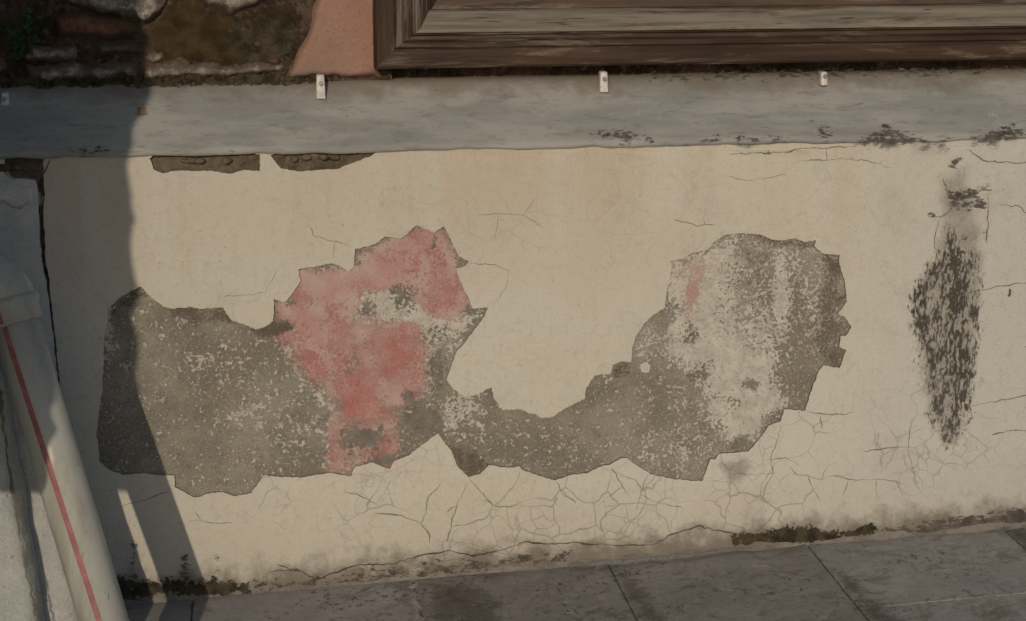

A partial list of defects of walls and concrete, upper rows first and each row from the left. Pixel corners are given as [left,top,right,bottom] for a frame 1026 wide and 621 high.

spalling [150,153,374,173]
damp [855,124,962,169]
peeling [97,226,850,496]
damp [908,179,992,450]
crack [740,422,923,499]
crack [269,467,744,583]